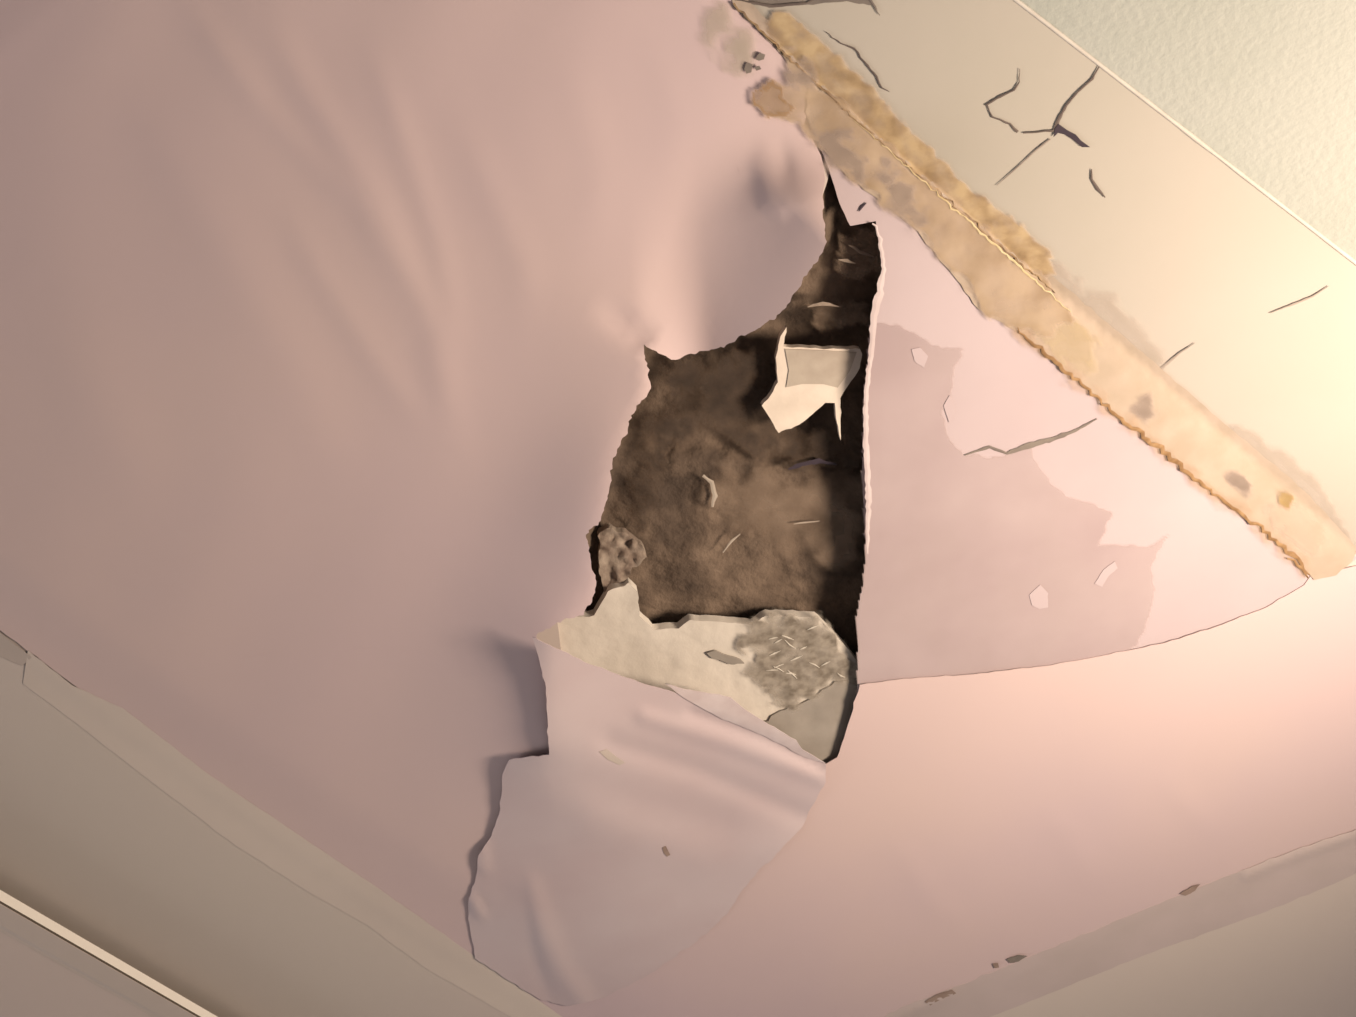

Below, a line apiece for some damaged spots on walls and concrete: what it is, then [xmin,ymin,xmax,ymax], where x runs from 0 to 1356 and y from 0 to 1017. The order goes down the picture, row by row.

water stain [707,3,1163,367]
crack [985,67,1105,198]
peeling [558,147,1310,763]
water stain [1133,395,1154,420]
water stain [1227,473,1251,493]
water stain [1234,428,1349,538]